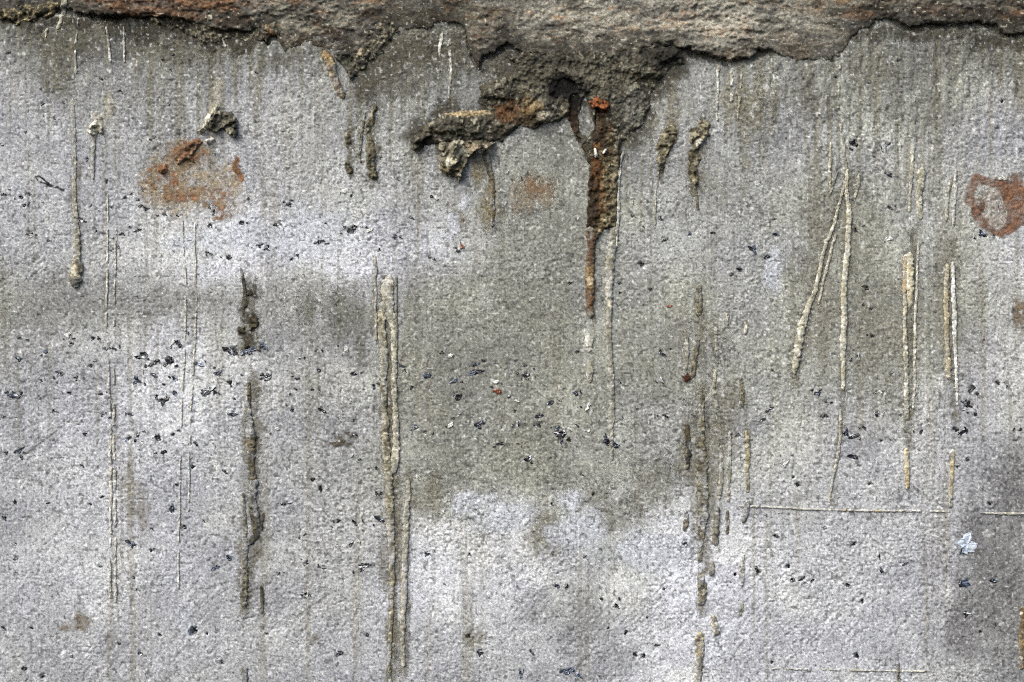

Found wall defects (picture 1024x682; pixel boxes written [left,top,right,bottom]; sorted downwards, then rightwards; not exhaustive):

peeling [334,51,375,80]
corrosion [140,104,243,220]
corrosion [966,174,1024,237]
leakage [236,267,262,354]
corrosion [575,113,625,461]
leakage [764,169,917,446]
leakage [927,255,956,380]
leakage [237,373,264,614]
leakage [323,432,357,447]
leakage [371,275,412,682]
leakage [453,284,751,682]
spalling [960,385,979,416]